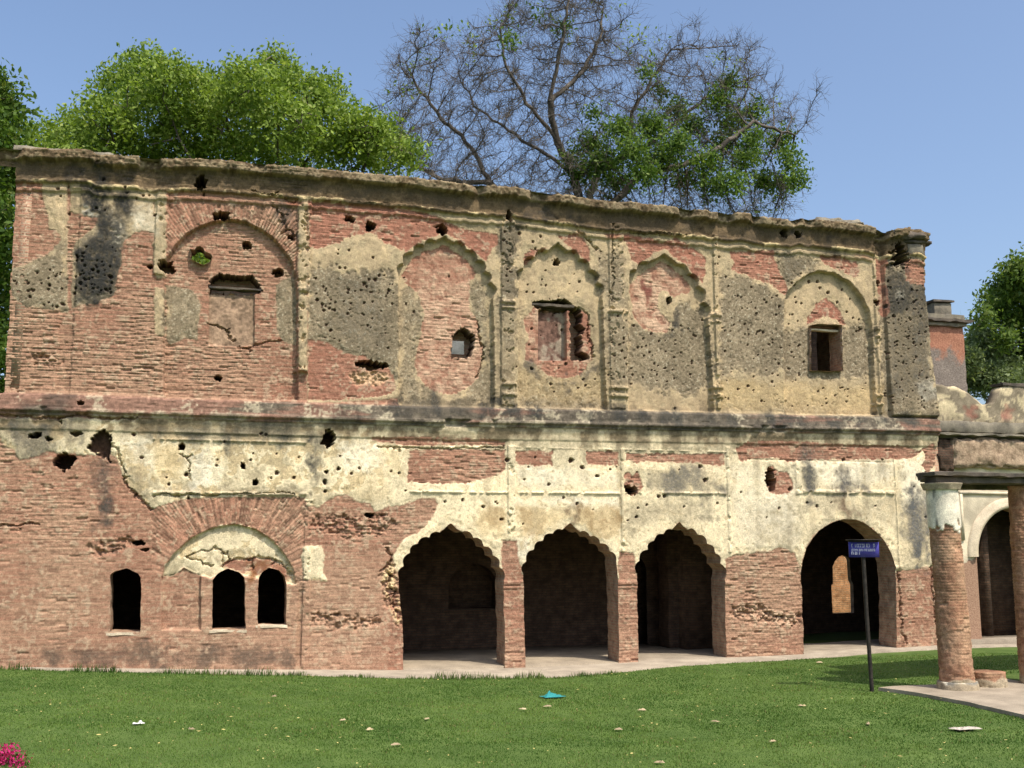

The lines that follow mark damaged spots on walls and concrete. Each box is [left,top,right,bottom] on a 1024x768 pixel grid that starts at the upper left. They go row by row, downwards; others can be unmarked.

leakage [68,165,103,210]
leakage [116,179,131,214]
peeling [11,183,156,313]
leakage [75,220,119,304]
spalling [308,200,499,394]
crack [206,322,284,353]
spalling [70,428,113,463]
spalling [372,436,554,484]
spalling [586,440,936,496]
spalling [88,536,150,557]
crack [185,544,296,575]
spalling [311,563,403,630]